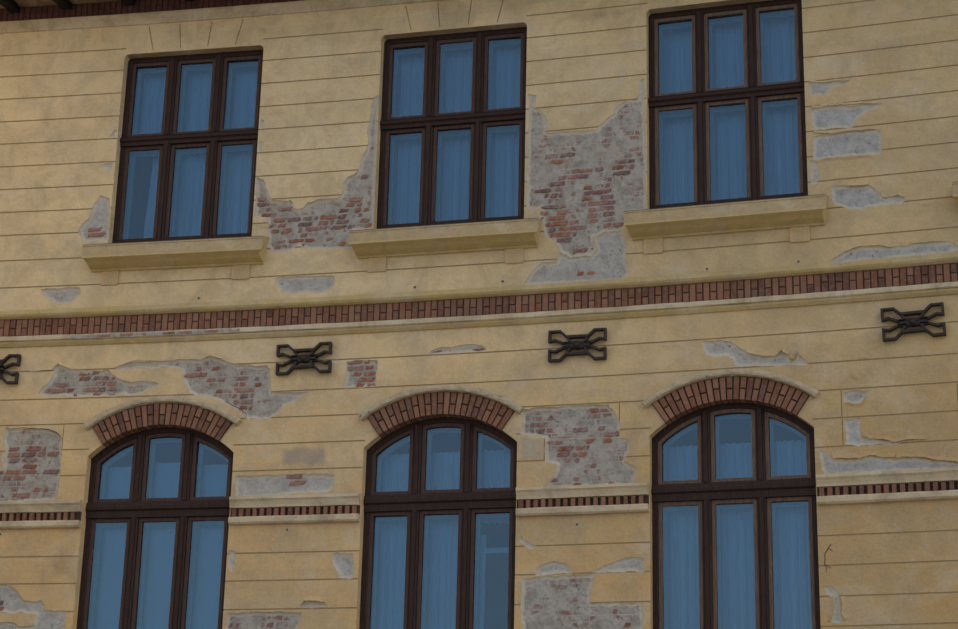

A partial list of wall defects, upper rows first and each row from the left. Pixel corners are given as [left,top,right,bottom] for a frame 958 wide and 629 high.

spalling [809,78,882,186]
spalling [78,195,110,242]
spalling [255,95,380,252]
spalling [523,78,647,285]
spalling [829,238,958,263]
spalling [30,354,308,419]
spalling [344,360,378,388]
spalling [0,427,62,502]
spalling [520,404,637,486]
spalling [819,390,958,474]
peeling [0,584,66,629]
spalling [521,557,645,629]